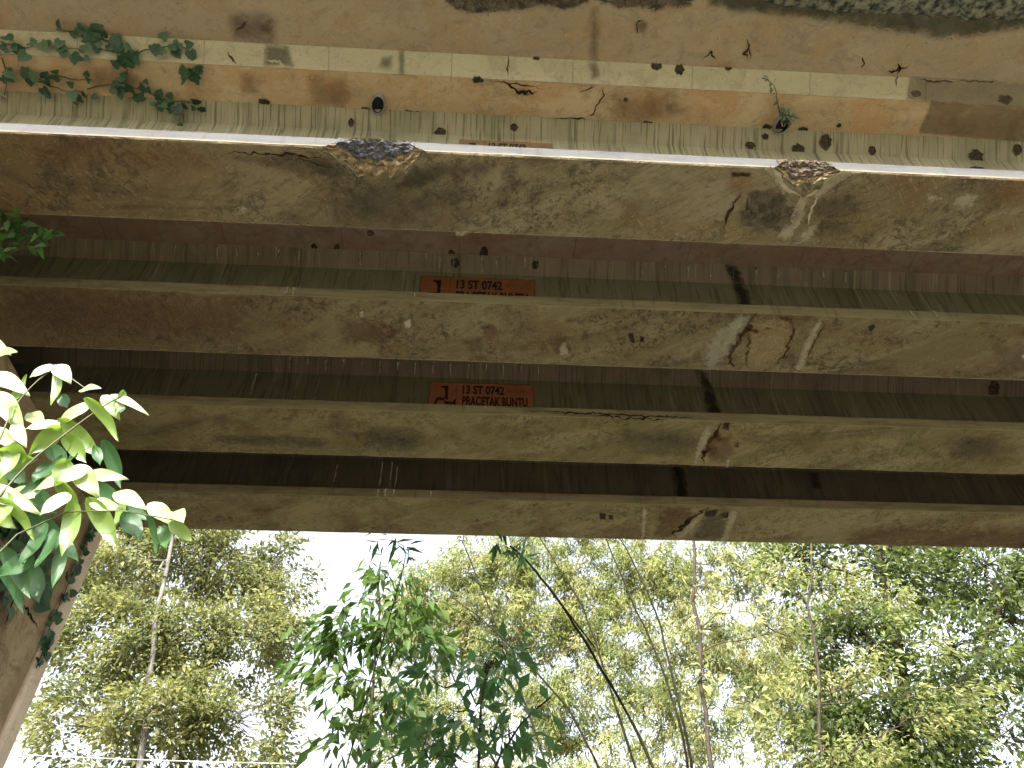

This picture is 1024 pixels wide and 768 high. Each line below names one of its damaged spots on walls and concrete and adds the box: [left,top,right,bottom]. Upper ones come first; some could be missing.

crack [489,56,536,95]
crack [555,86,605,120]
crack [227,151,334,169]
spalling [278,118,469,184]
spalling [775,123,841,186]
water stain [726,265,758,305]
water stain [796,320,824,370]
water stain [697,373,720,413]
crack [531,411,739,467]
crack [672,508,729,538]